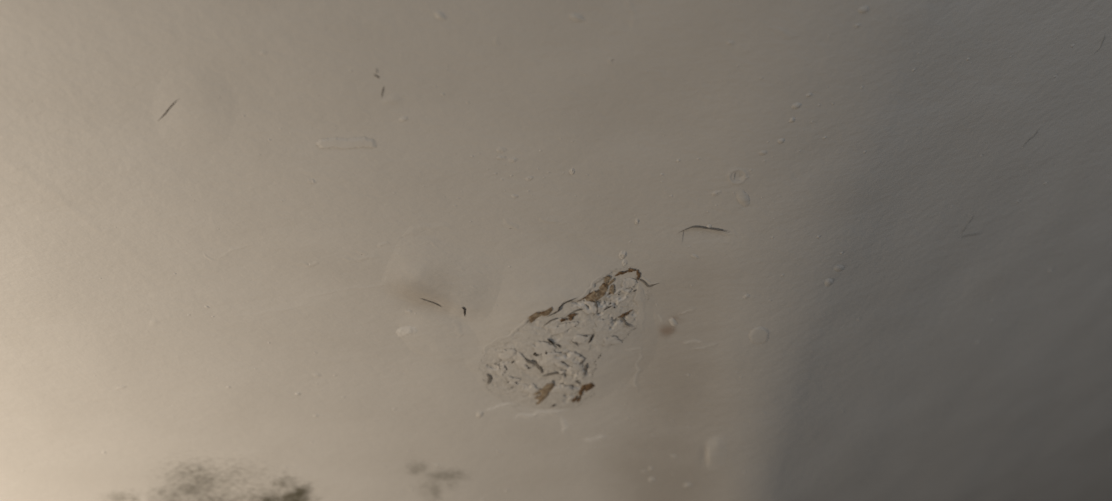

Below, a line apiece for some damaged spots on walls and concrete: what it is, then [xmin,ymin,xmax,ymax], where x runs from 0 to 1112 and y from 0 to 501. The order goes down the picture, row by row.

spalling [479,266,653,413]
mould [265,488,306,501]